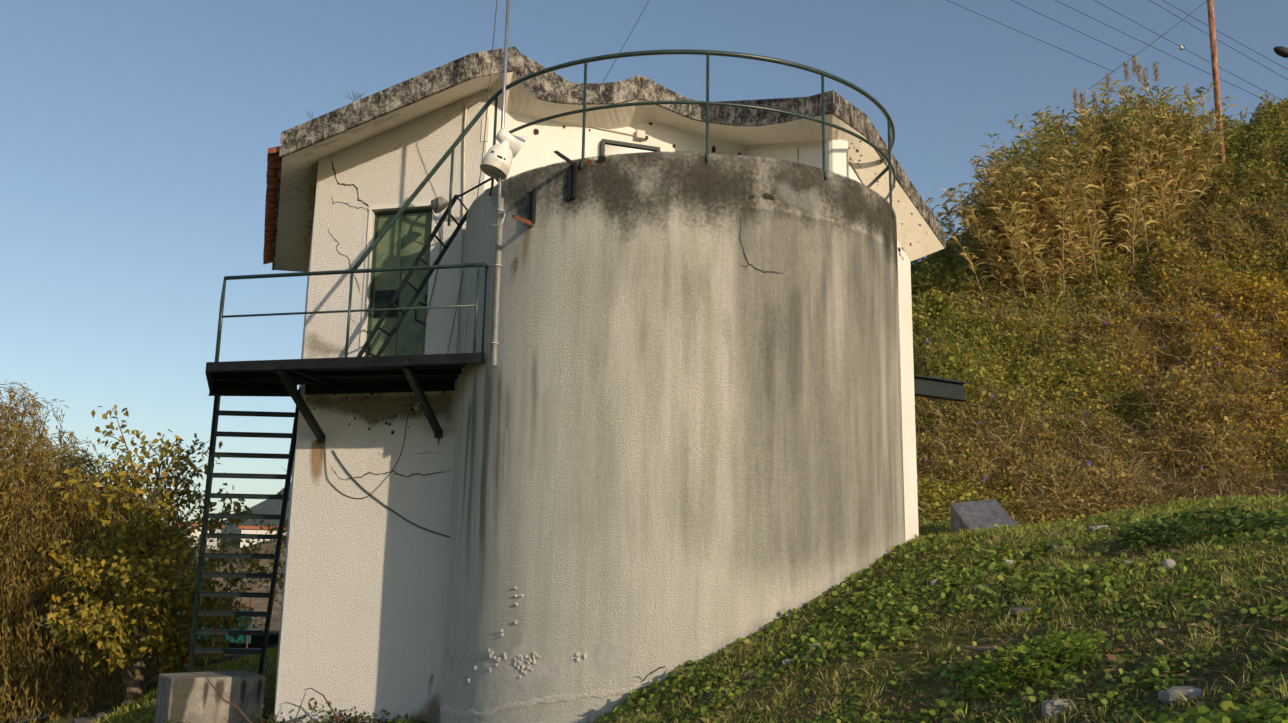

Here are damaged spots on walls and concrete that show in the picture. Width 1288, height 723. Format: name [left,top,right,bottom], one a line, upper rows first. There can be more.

crack [328,157,373,322]
crack [739,217,783,274]
rust [312,440,323,476]
peeling [440,586,589,723]